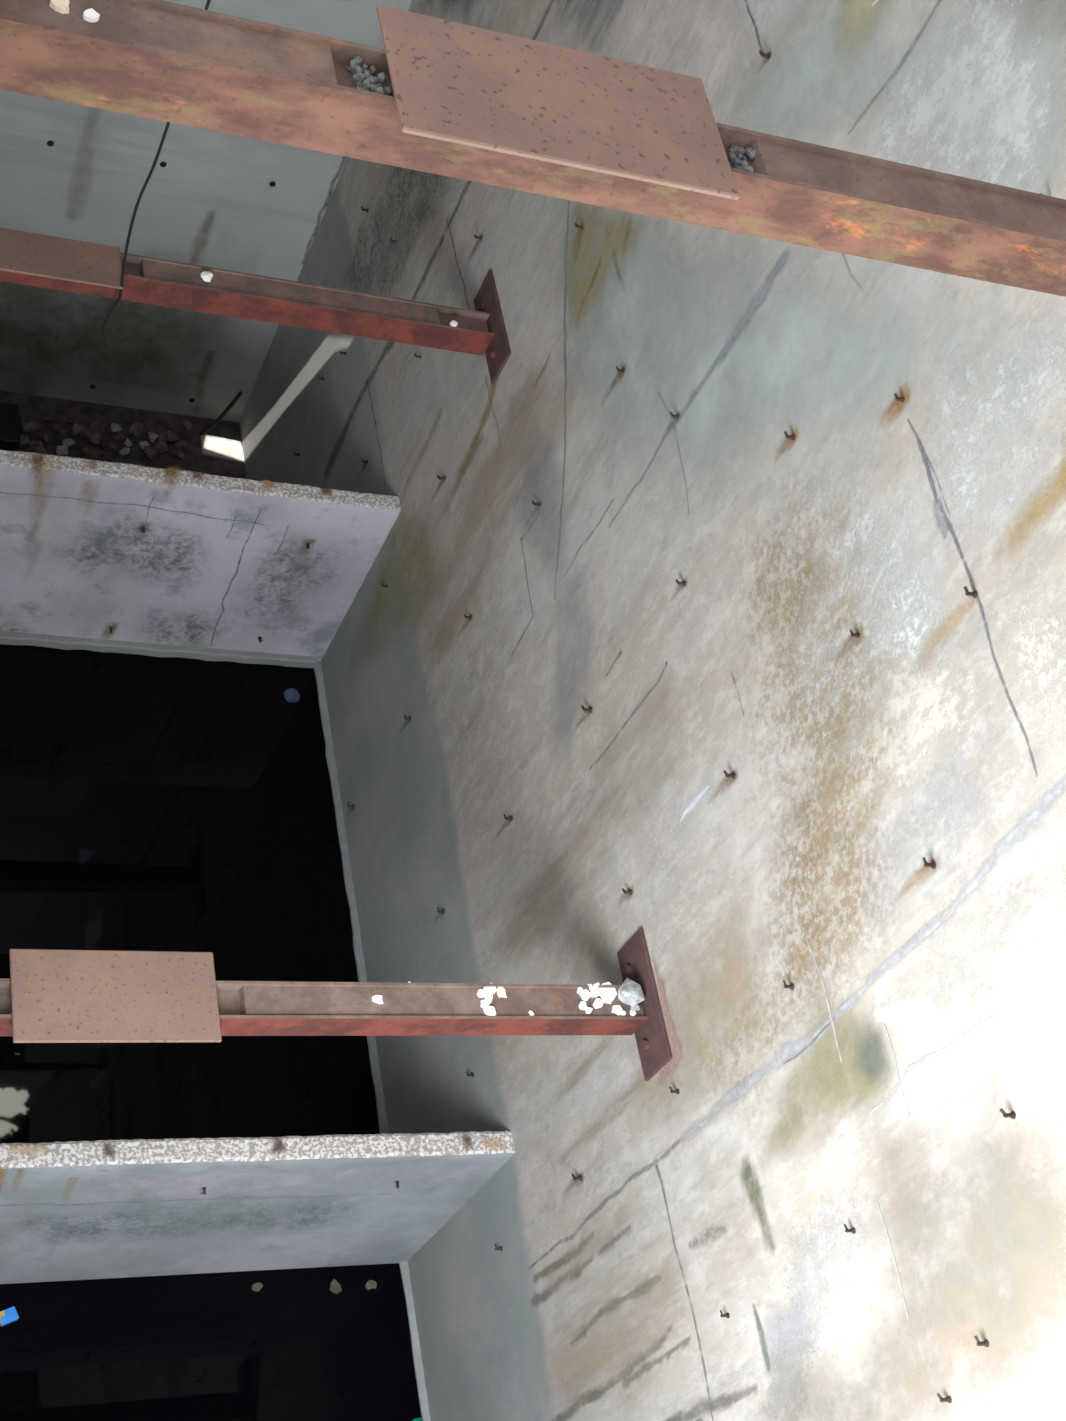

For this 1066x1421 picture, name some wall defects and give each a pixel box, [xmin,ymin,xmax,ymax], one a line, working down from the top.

crack [745,0,766,59]
water stain [738,0,798,37]
water stain [72,525,192,572]
crack [907,419,1037,776]
crack [784,1022,831,1064]
crack [656,1165,713,1420]